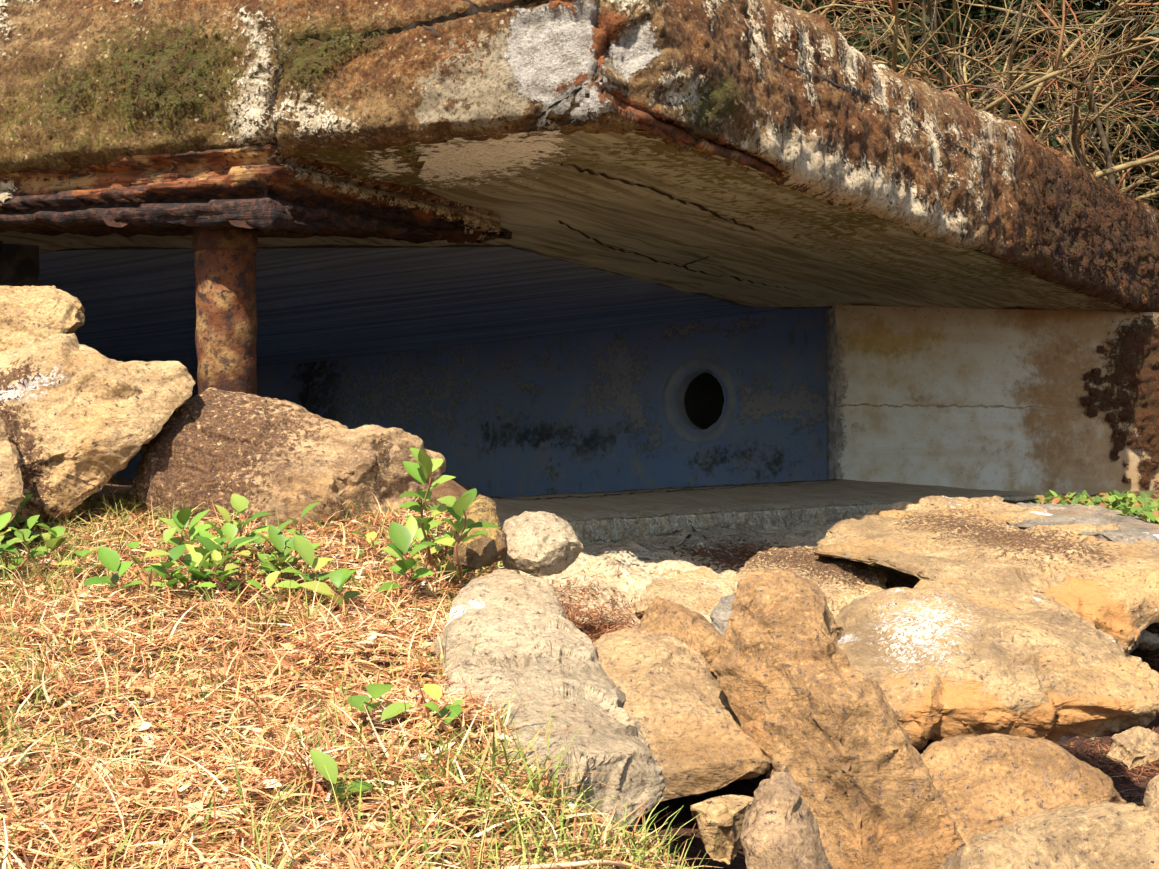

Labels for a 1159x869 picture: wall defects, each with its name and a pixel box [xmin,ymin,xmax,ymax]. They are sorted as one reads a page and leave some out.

damp [0,0,48,57]
damp [575,0,674,35]
damp [213,0,574,241]
crack [256,0,549,146]
crack [526,9,635,133]
spalling [502,0,790,180]
corrosion [103,218,131,228]
corrosion [228,220,260,229]
crack [558,162,756,231]
crack [558,220,802,291]
damp [481,423,652,452]